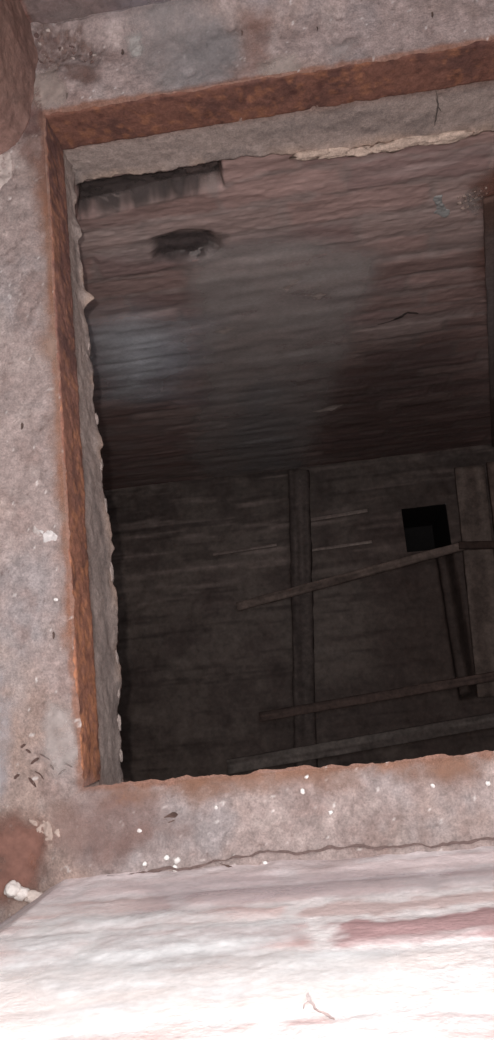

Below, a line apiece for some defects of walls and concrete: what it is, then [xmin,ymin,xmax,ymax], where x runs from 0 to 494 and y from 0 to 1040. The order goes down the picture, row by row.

spalling [289,130,475,161]
crack [107,837,494,876]